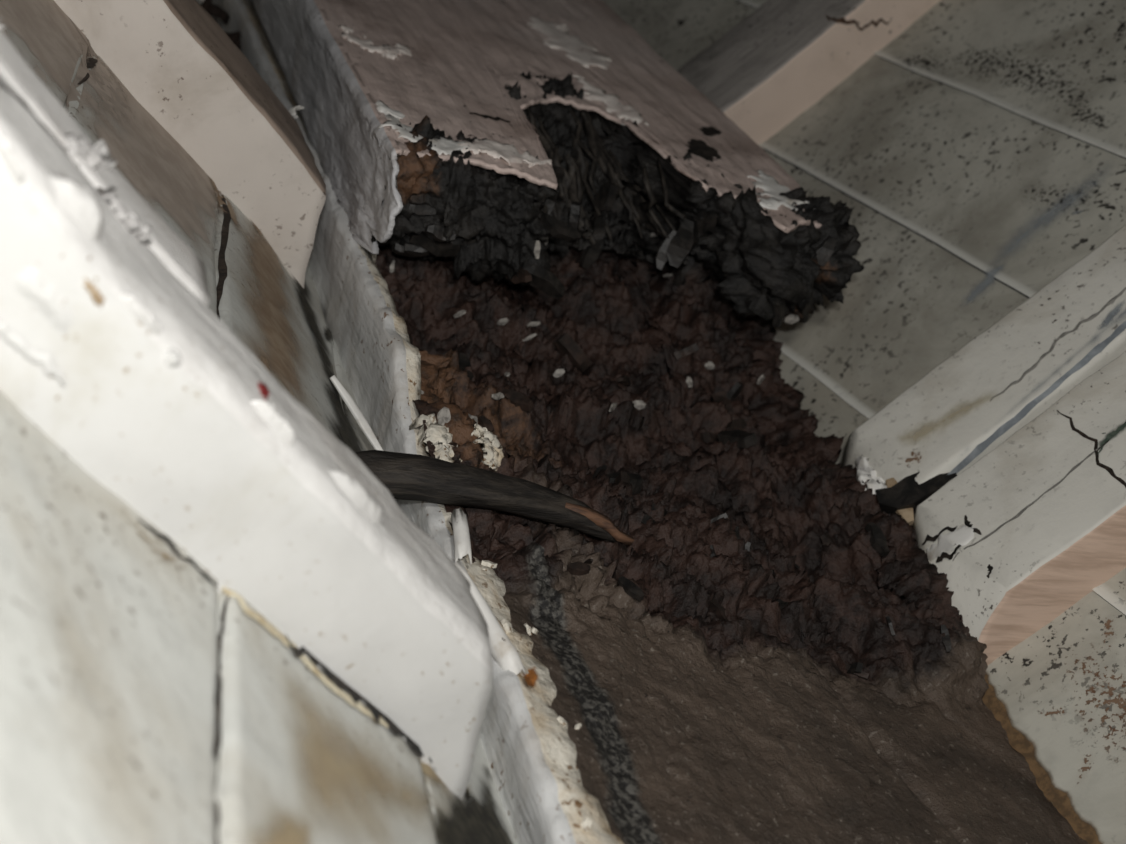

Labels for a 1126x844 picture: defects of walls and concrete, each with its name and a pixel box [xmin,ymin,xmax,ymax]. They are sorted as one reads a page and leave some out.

crack [826,15,892,31]
crack [216,195,231,320]
spalling [371,17,1089,844]
crack [952,410,1126,578]
crack [138,518,436,844]